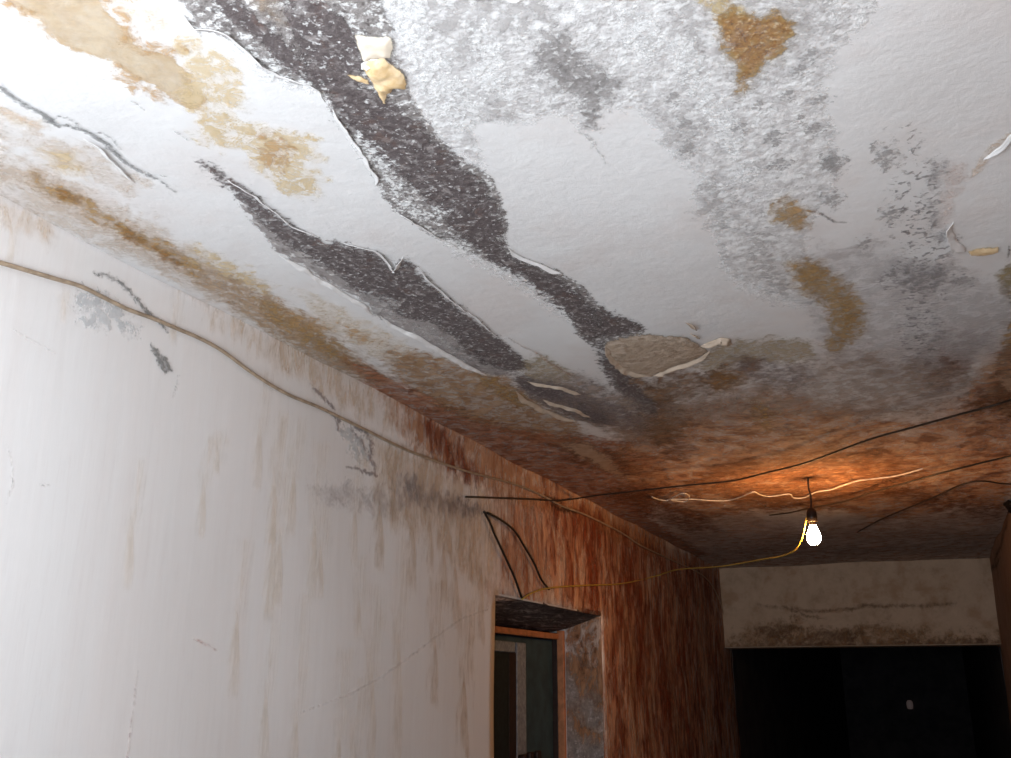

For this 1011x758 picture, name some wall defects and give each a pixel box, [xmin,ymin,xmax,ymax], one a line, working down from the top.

crack [0,87,164,184]
damp [3,0,317,194]
flaking render [177,0,732,429]
damp [384,0,974,436]
peeling [983,134,1011,160]
crack [313,388,376,477]
corrosion [32,172,1011,758]